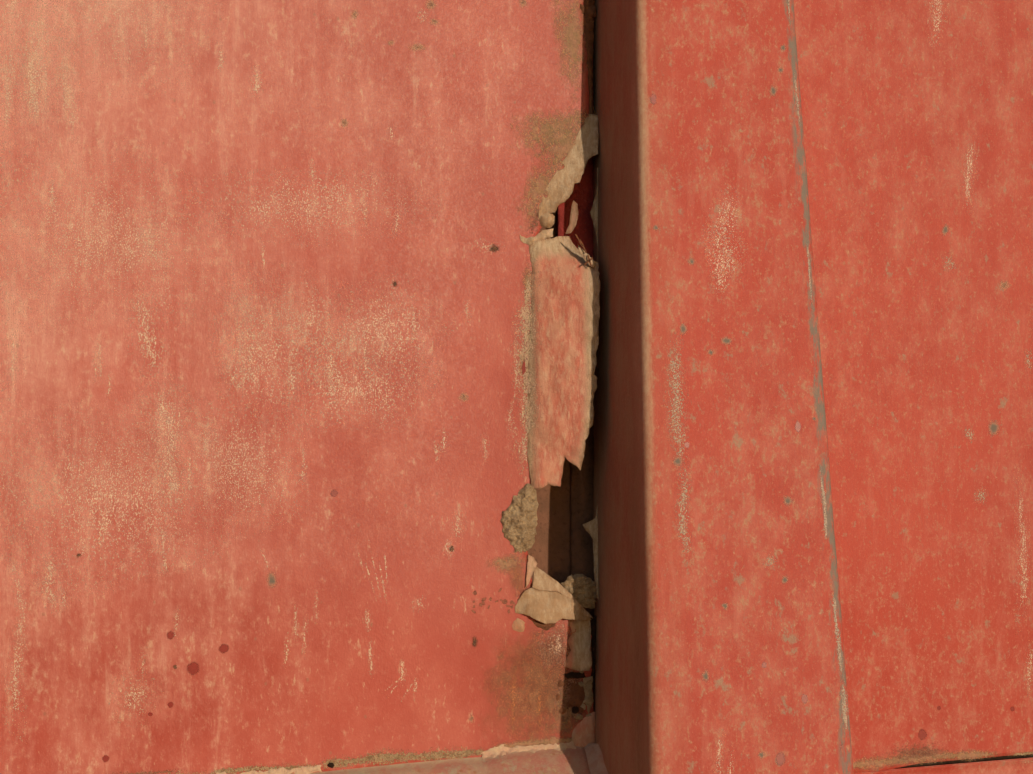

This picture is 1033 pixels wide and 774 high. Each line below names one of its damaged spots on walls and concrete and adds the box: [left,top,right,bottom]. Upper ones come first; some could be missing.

peeling [507,236,601,489]
peeling [564,619,592,671]